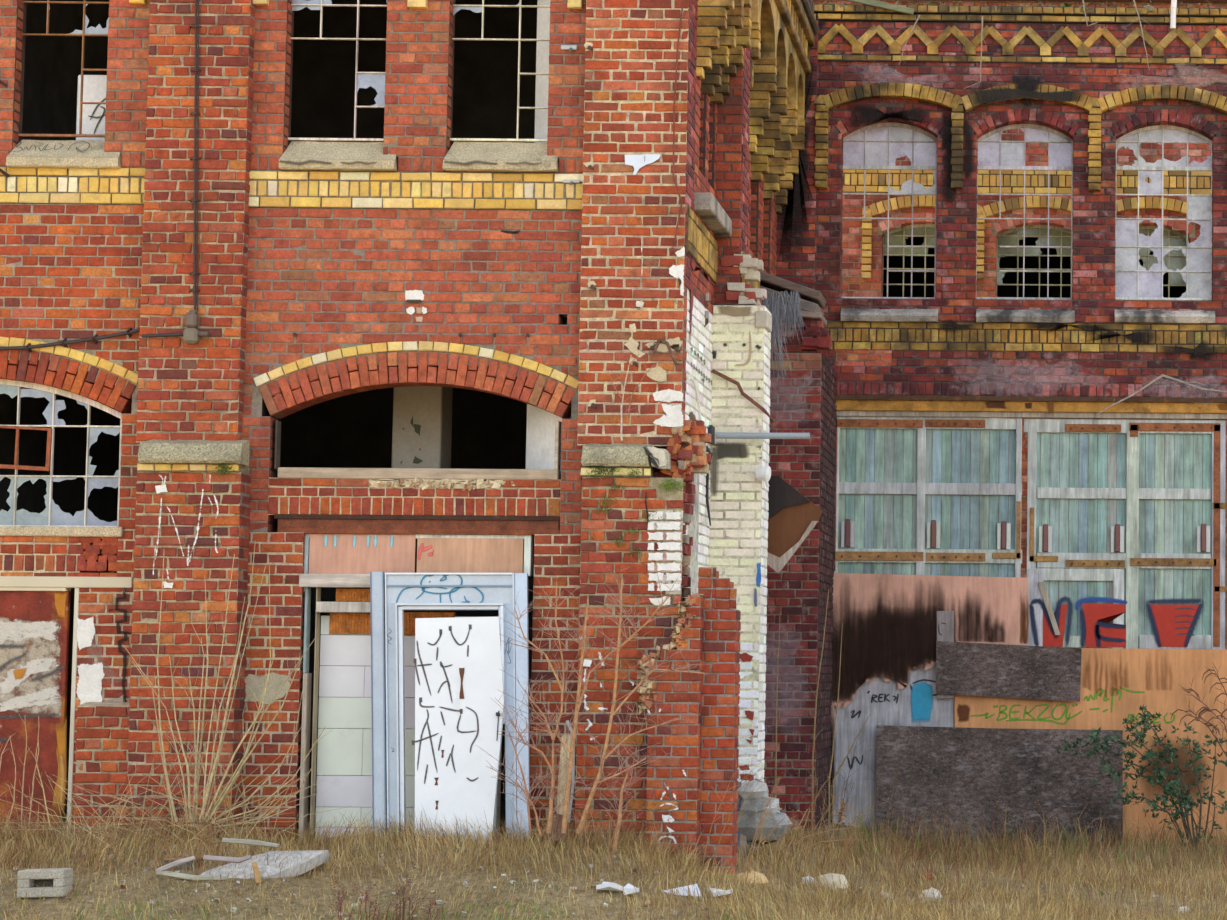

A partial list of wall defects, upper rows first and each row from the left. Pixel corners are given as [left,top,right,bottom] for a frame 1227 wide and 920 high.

peeling [675,247,710,282]
spalling [646,286,696,480]
peeling [647,512,682,606]
corrosion [55,593,66,617]
peeling [76,663,123,705]
corrosion [53,723,67,808]